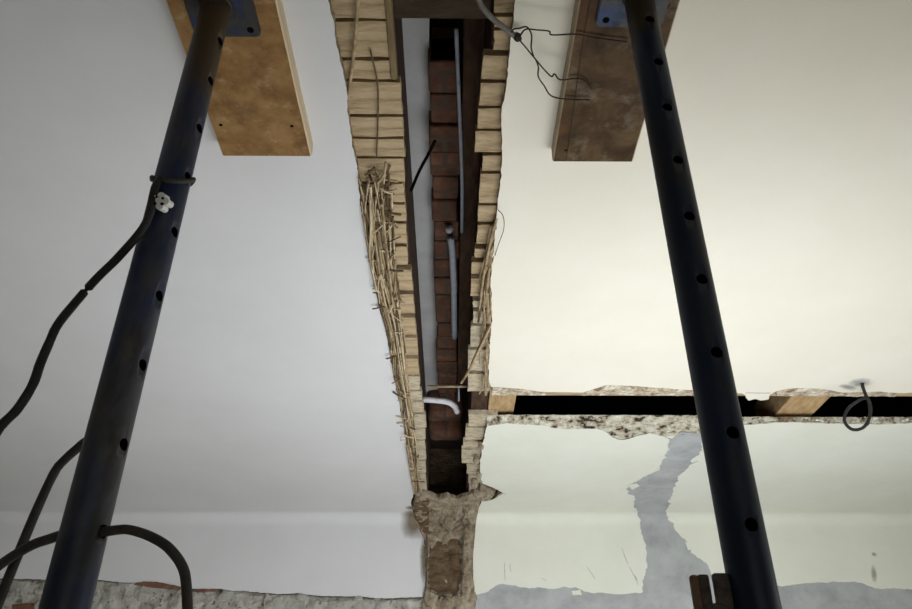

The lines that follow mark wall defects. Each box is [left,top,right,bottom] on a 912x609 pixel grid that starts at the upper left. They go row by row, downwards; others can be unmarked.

flaking render [492,387,545,396]
flaking render [582,385,694,396]
flaking render [745,388,896,401]
flaking render [742,416,912,425]
spalling [192,414,716,609]
flaking render [0,580,46,609]
flaking render [91,581,182,609]
peeling [778,581,912,609]